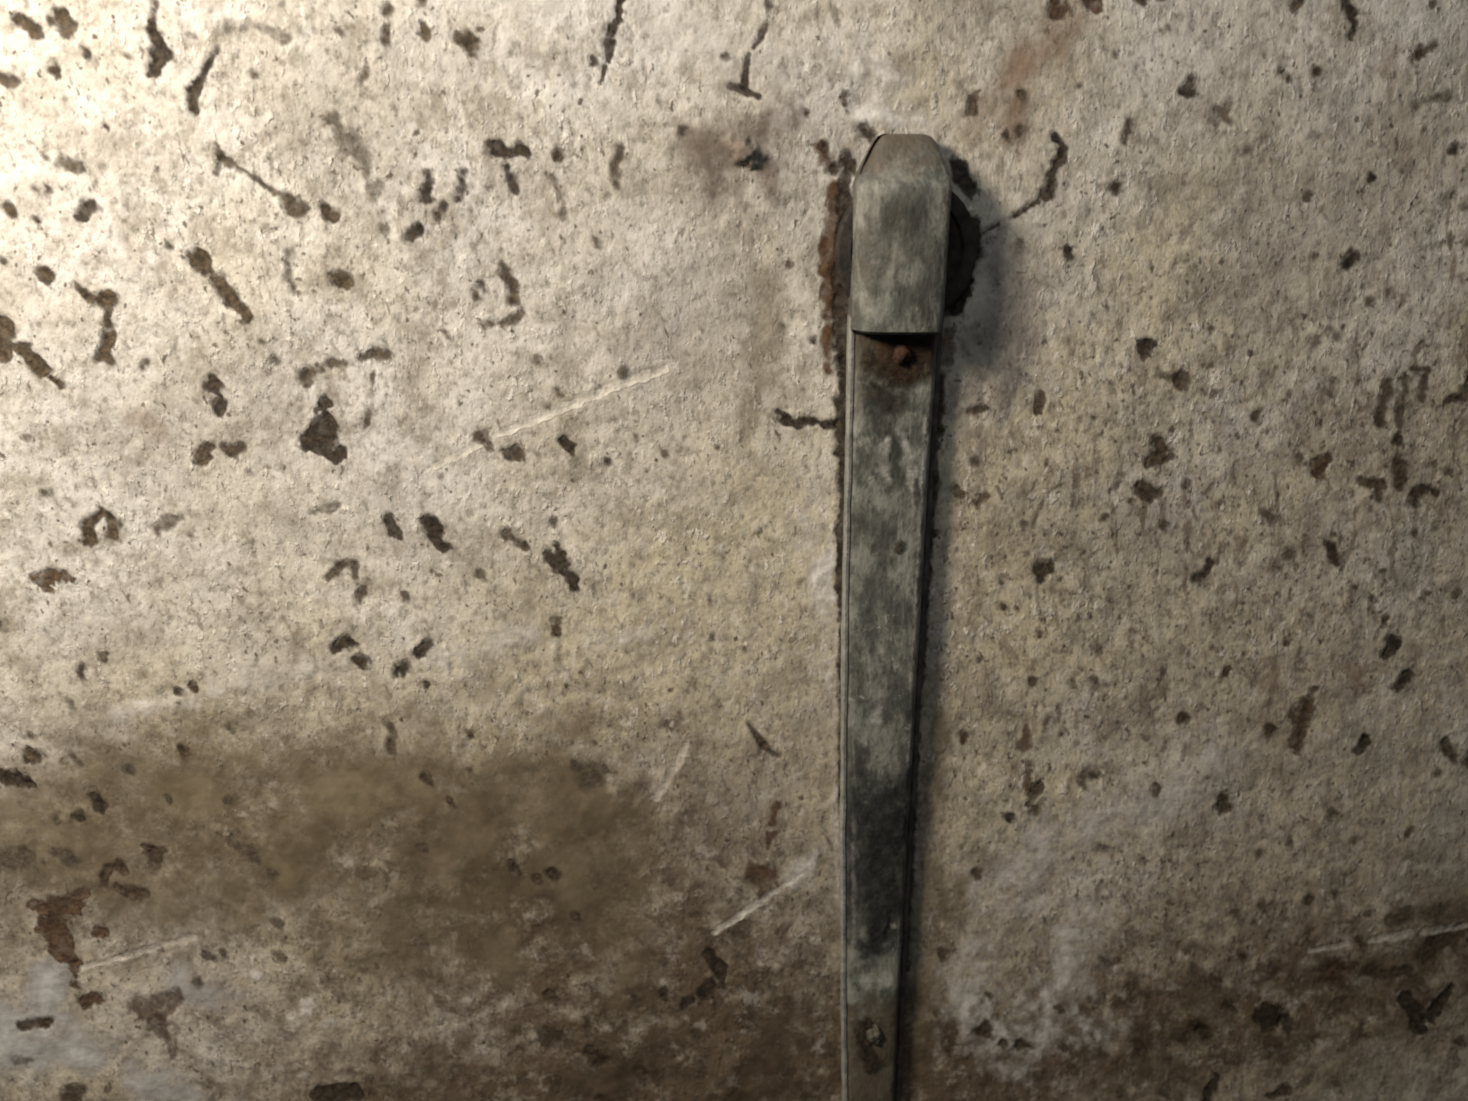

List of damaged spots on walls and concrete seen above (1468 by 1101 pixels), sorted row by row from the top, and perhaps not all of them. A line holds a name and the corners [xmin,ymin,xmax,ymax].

rust [814,140,840,374]
leakage [85,751,226,824]
leakage [268,747,648,924]
leakage [738,900,765,917]
leakage [790,852,817,883]
leakage [0,961,105,1069]
leakage [289,998,327,1029]
leakage [989,902,1097,1079]